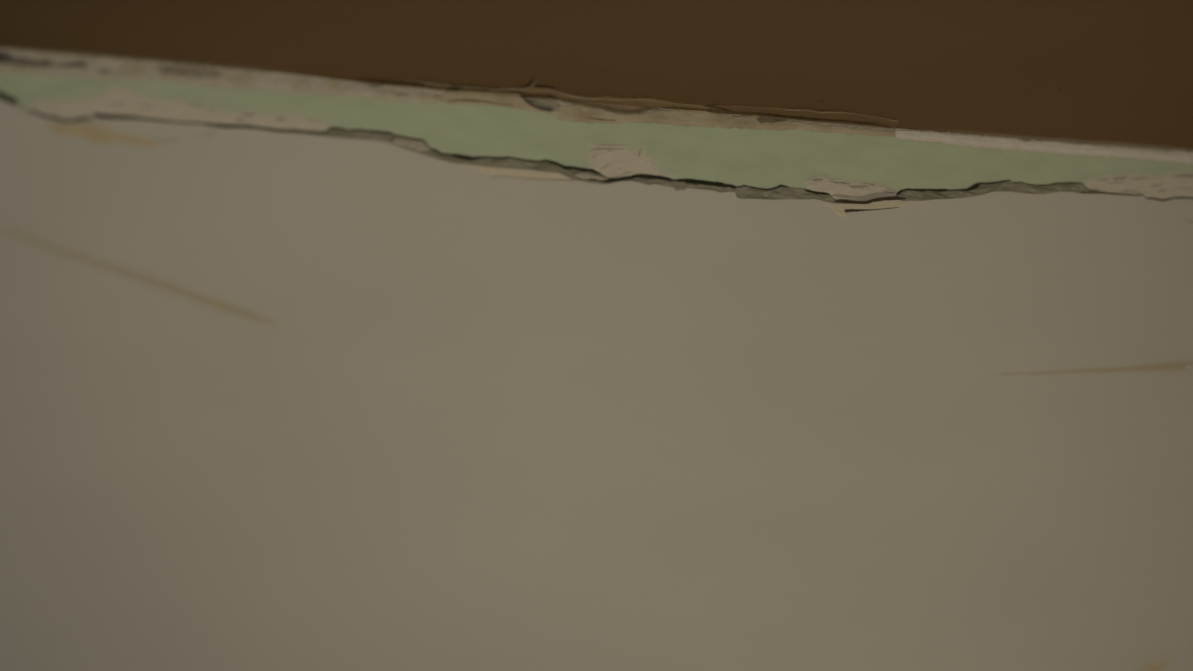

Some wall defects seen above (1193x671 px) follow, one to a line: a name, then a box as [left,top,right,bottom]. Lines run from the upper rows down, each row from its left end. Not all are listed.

peeling [0,71,1193,217]